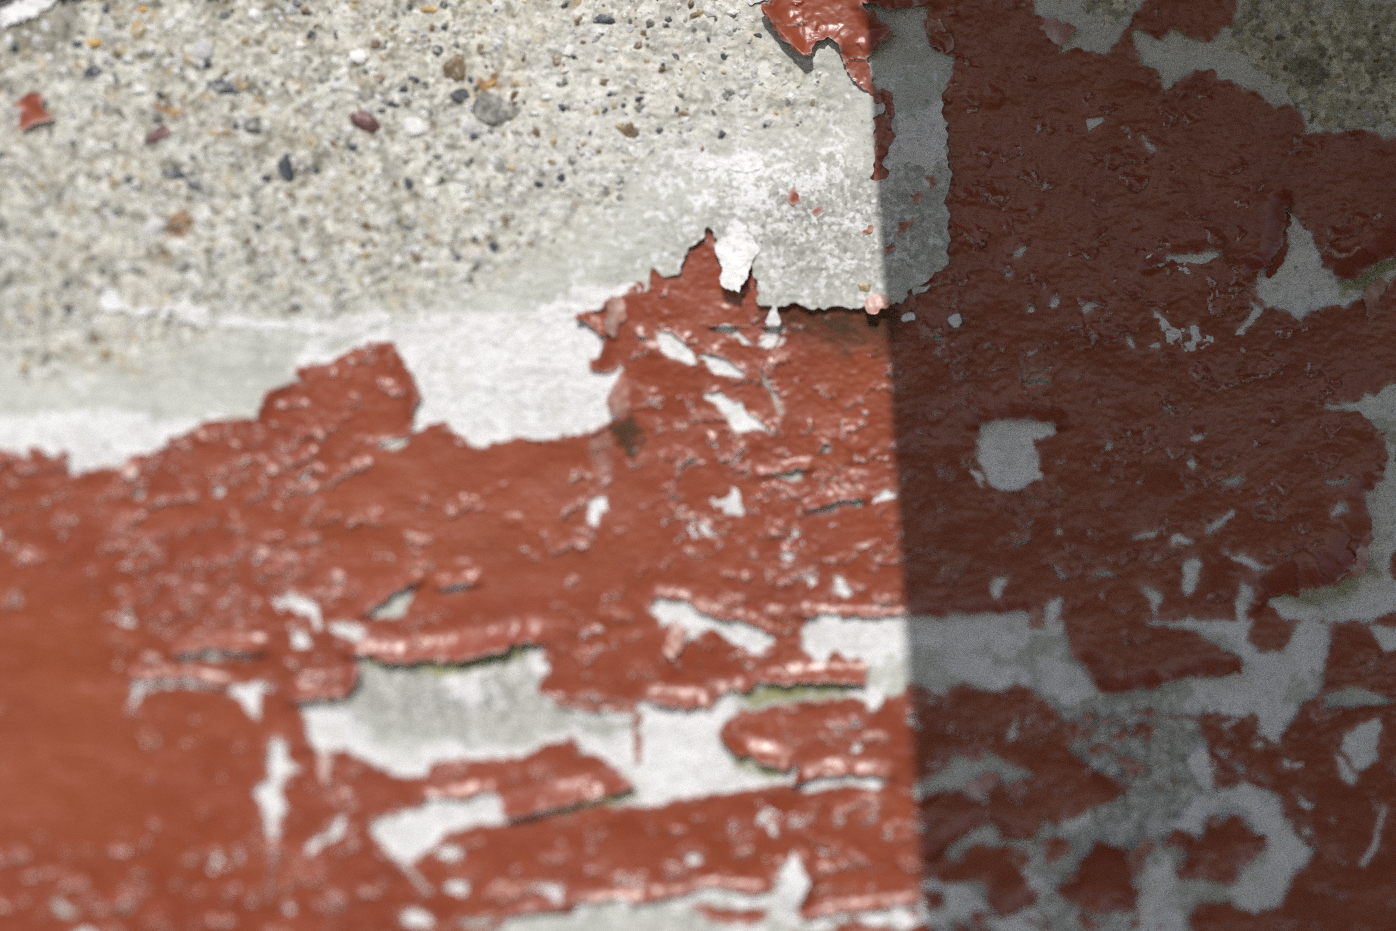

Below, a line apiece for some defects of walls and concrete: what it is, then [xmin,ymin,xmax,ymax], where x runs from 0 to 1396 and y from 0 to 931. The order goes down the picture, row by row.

spalling [1033,0,1396,139]
spalling [0,0,957,499]
peeling [929,314,965,343]
peeling [1235,208,1396,335]
peeling [130,648,275,718]
spalling [271,384,1396,931]
peeling [254,739,300,838]